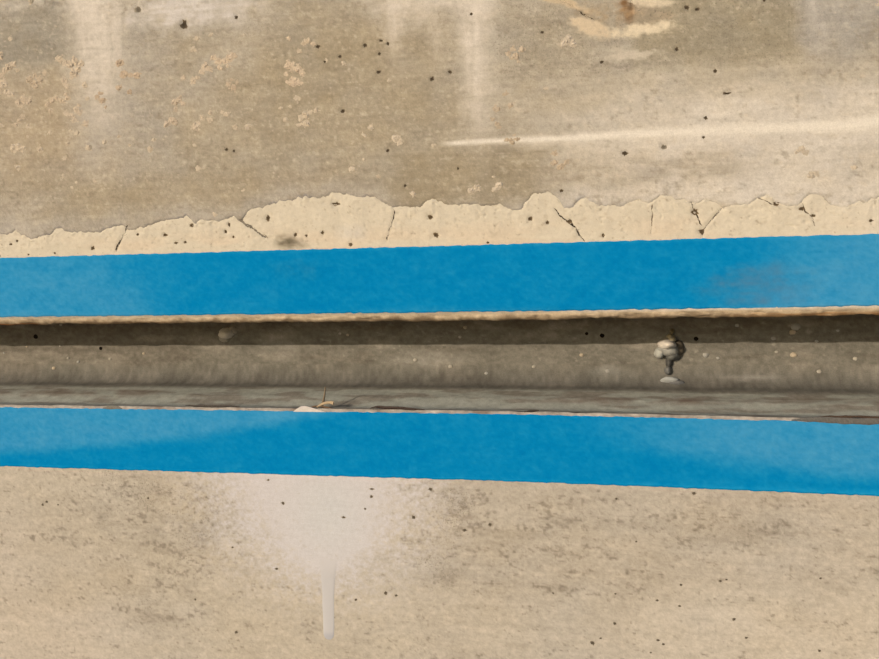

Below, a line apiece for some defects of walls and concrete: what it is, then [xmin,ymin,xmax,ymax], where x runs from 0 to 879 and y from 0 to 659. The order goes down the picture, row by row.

corrosion [555,0,649,27]
water stain [52,0,279,171]
spalling [0,189,879,258]